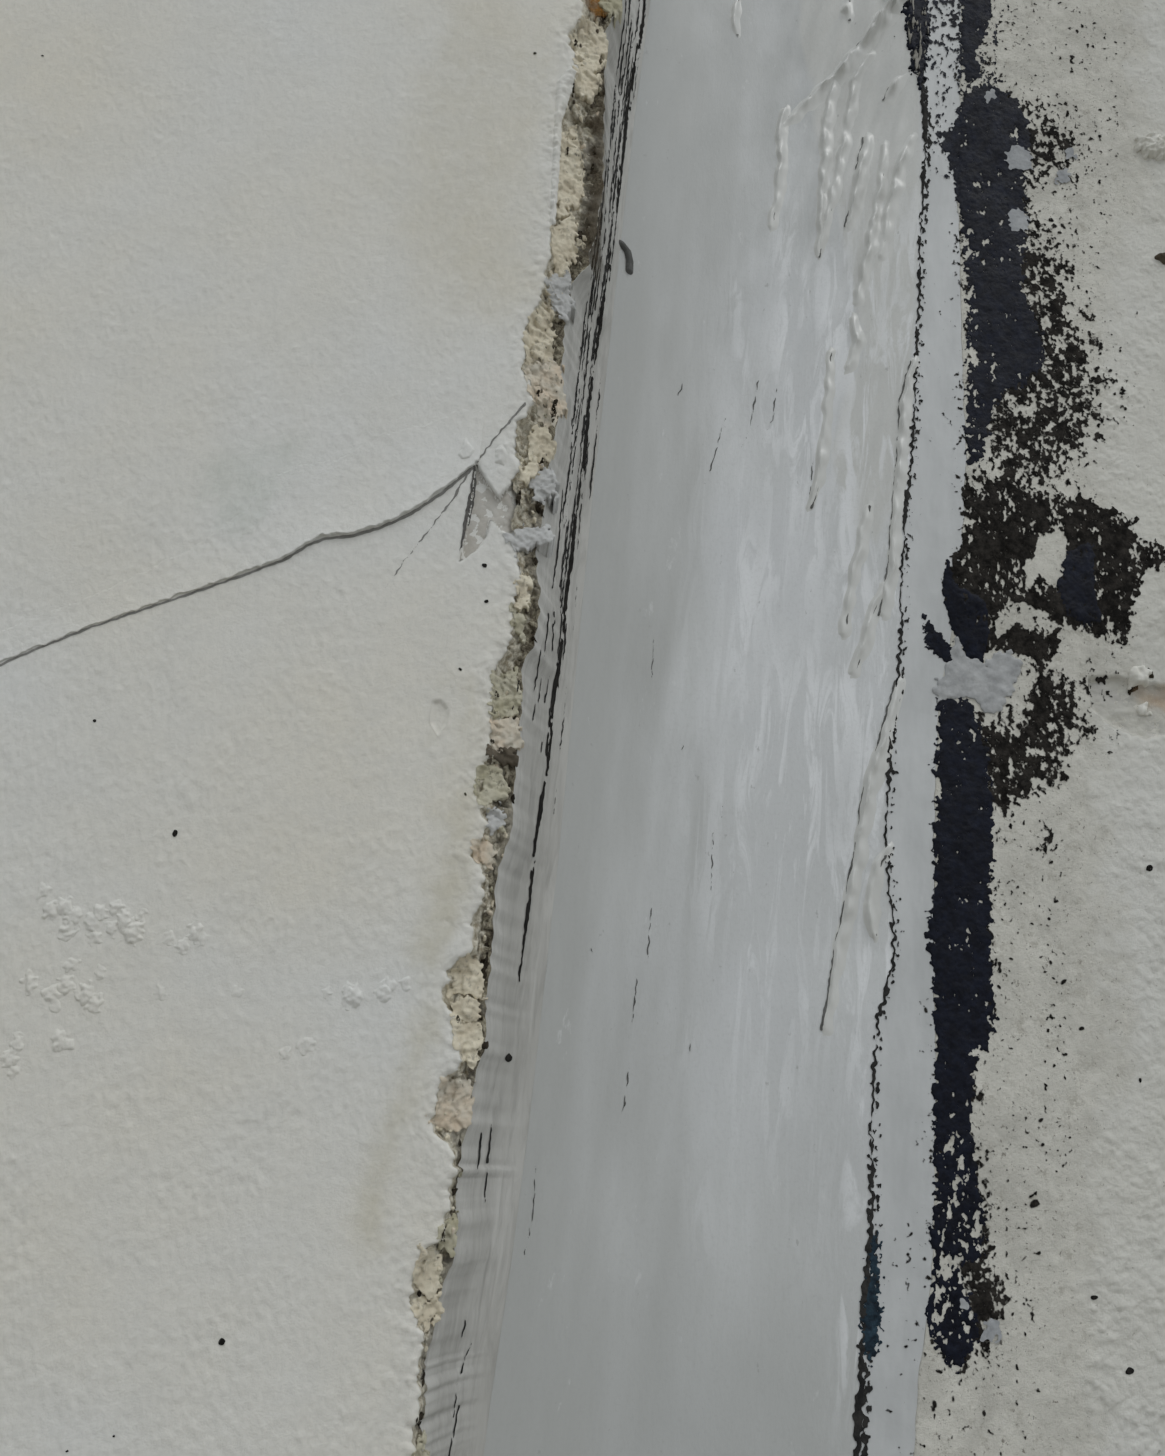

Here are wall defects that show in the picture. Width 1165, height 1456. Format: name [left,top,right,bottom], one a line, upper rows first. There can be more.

crack [0,402,526,667]
spalling [409,0,623,1456]